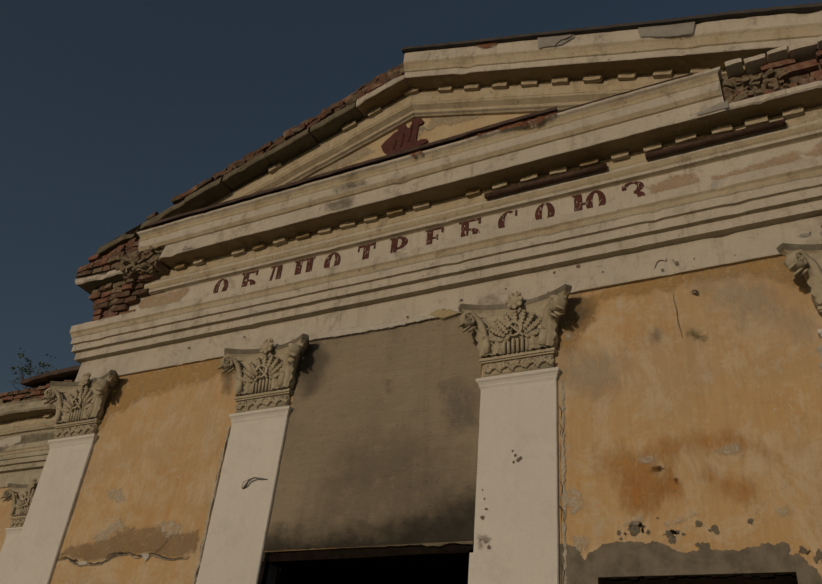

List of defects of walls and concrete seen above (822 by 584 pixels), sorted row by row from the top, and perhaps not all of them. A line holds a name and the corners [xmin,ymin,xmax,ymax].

spalling [697,36,822,115]
spalling [170,62,405,205]
spalling [75,211,188,321]
peeling [61,520,198,560]
crack [57,426,230,584]
flaking render [603,572,797,582]